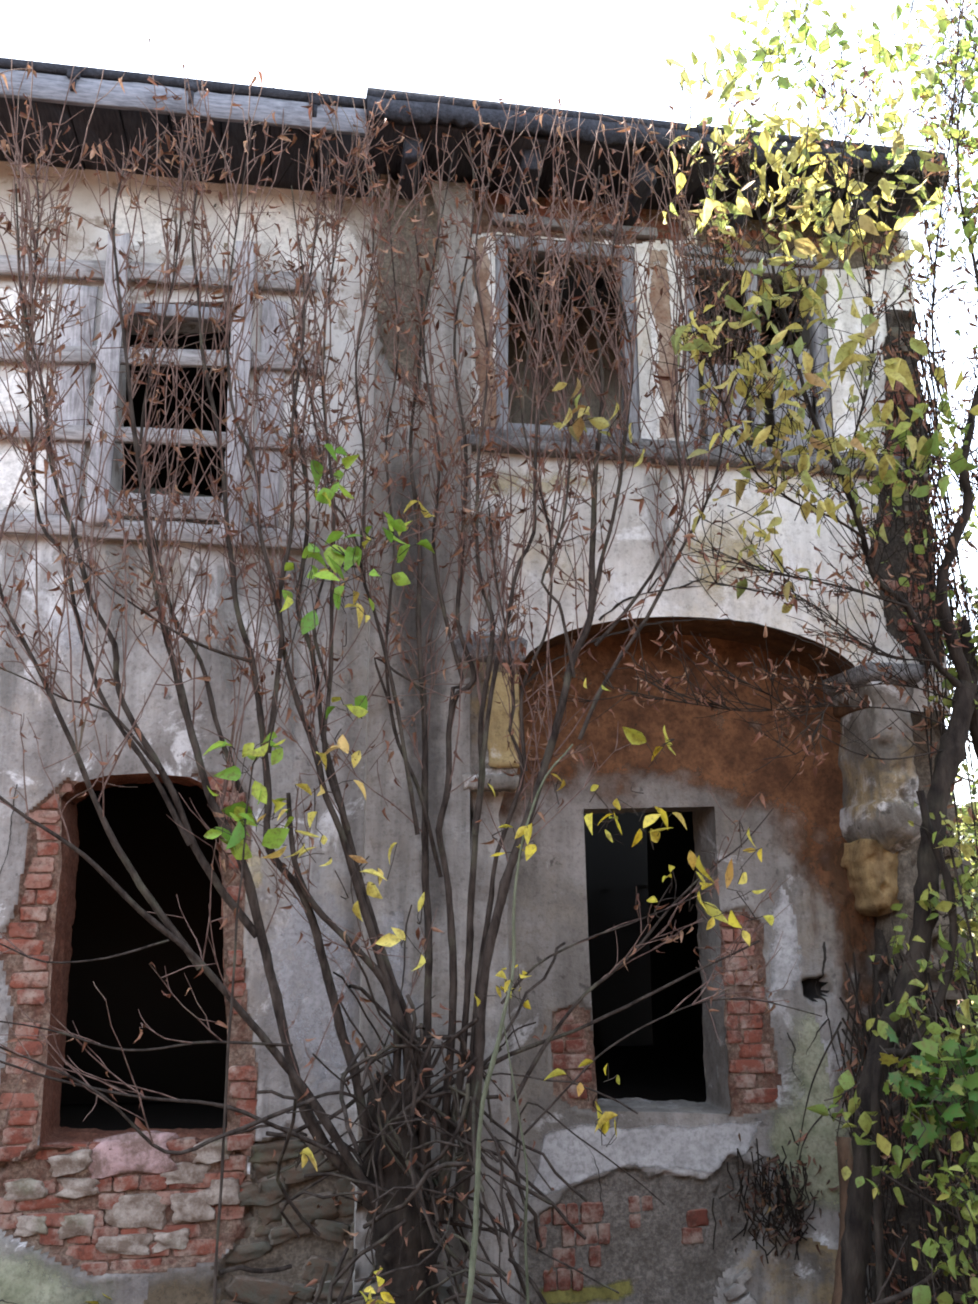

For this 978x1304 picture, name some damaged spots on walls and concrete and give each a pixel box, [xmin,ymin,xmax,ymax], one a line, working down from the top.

spalling [0,773,355,1304]
flaking render [551,1004,598,1112]
flaking render [718,909,782,1117]
flaking render [519,1159,764,1304]